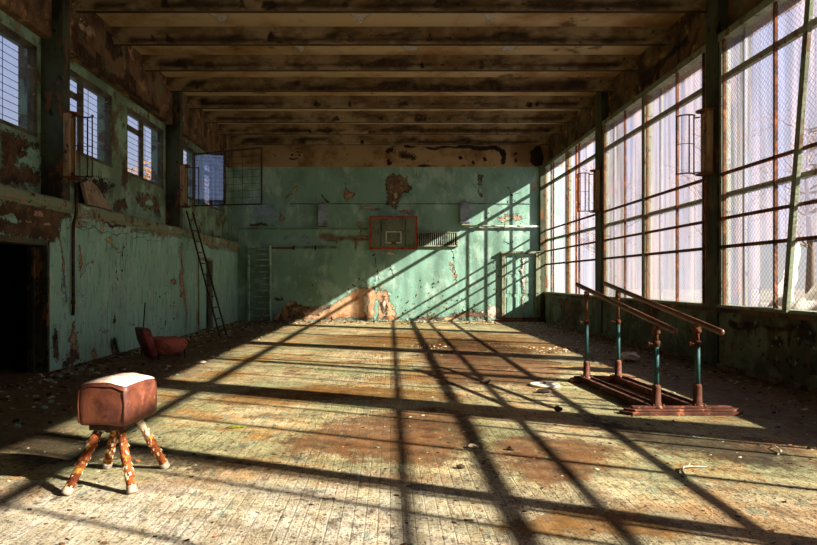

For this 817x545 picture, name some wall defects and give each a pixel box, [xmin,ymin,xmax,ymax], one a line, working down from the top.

water stain [76,32,355,114]
water stain [332,58,430,68]
water stain [226,80,589,92]
water stain [383,32,568,53]
flaking render [0,127,41,191]
water stain [216,115,344,160]
water stain [361,102,579,167]
peeling [343,173,414,239]
flaking render [0,199,238,332]
flaking render [273,262,501,321]
flaking render [51,321,81,368]